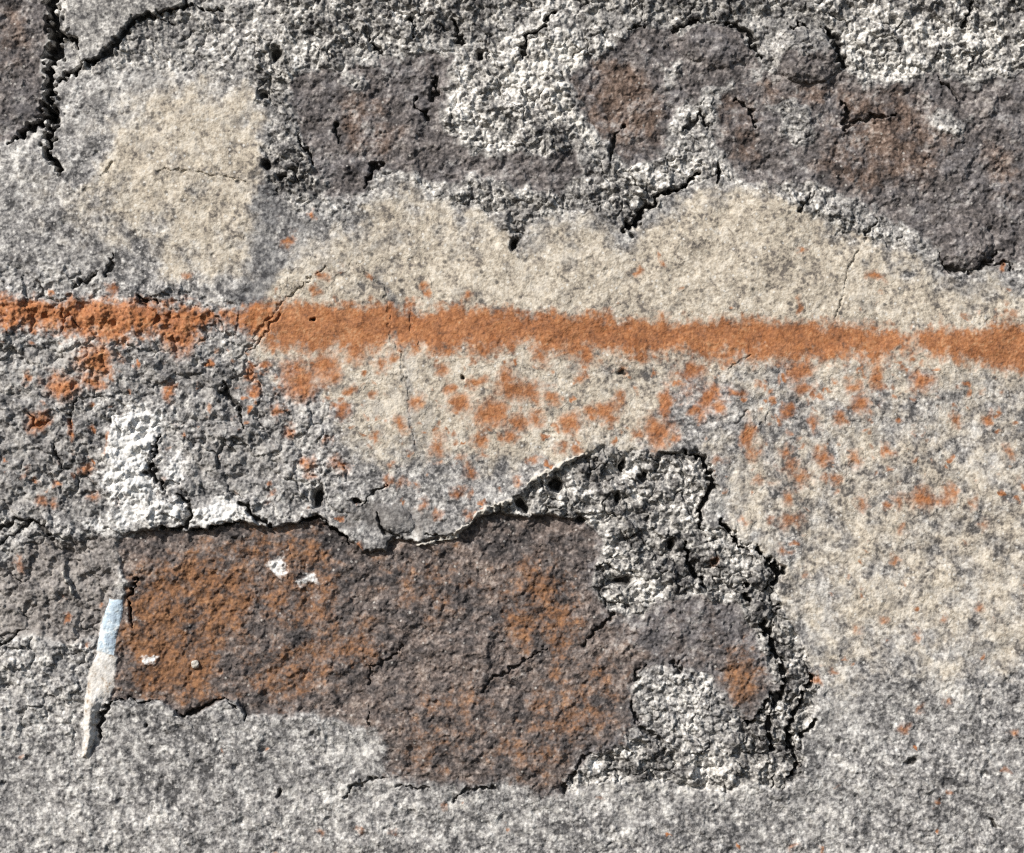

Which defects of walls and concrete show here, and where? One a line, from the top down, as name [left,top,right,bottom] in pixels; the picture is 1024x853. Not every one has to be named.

crack [7,0,225,177]
crack [156,167,245,184]
crack [621,162,723,239]
rust [628,248,669,281]
spalling [118,529,193,574]
rust [0,258,1024,813]
spalling [307,446,818,798]
rust [784,835,826,853]